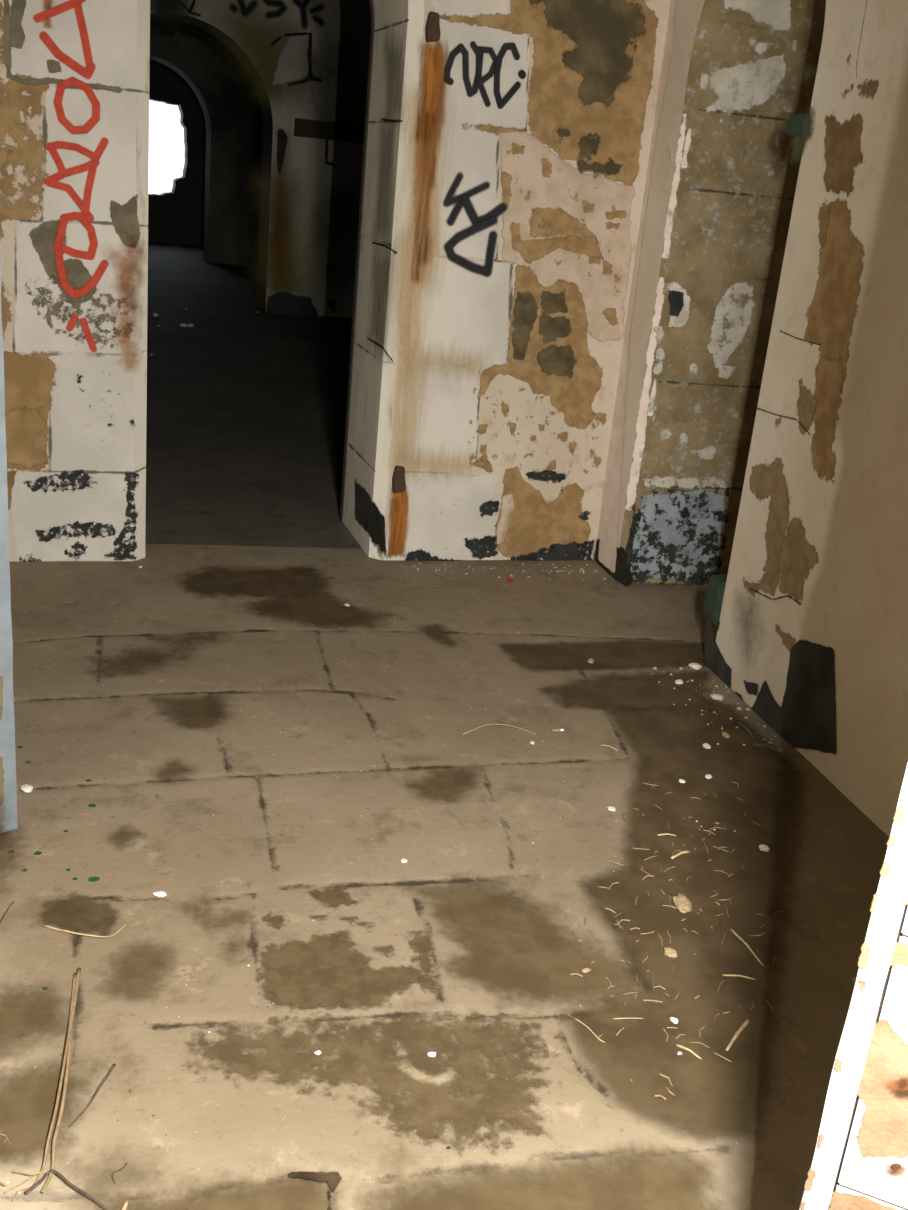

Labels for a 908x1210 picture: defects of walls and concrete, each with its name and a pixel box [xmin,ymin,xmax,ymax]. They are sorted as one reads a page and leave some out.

peeling [0,0,140,347]
rust [401,42,471,469]
peeling [795,113,865,483]
peeling [1,278,97,510]
peeling [35,472,139,561]
rust [389,489,408,557]
leakage [183,567,380,627]
leakage [188,641,801,1152]
rust [890,1078,908,1097]
leakage [118,1178,331,1210]
leakage [383,1151,715,1210]
rust [887,1166,905,1175]